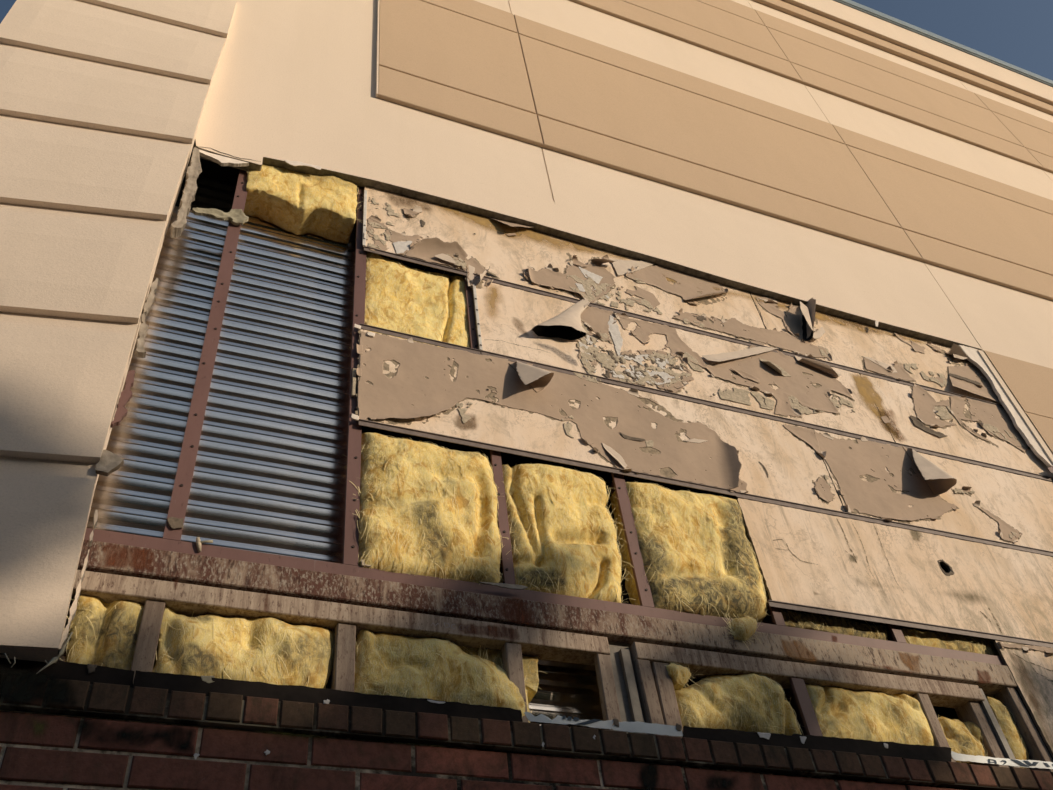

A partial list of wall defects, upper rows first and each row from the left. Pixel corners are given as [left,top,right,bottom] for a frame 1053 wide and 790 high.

flaking render [170,146,249,238]
spalling [366,251,463,276]
flaking render [134,278,159,358]
flaking render [110,370,135,428]
spalling [599,381,858,439]
damp [853,376,901,438]
spalling [362,426,893,604]
spalling [745,528,887,626]
spalling [937,559,954,576]
spalling [933,706,959,720]